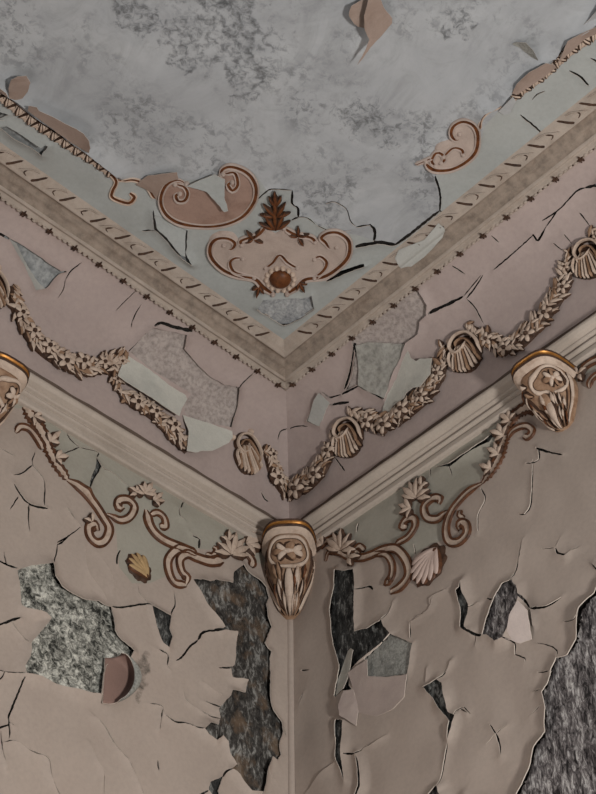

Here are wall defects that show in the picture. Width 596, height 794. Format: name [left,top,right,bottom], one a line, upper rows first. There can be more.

crack [328,176,442,279]
crack [429,184,596,324]
peeling [118,318,246,453]
peeling [303,284,437,433]
crack [424,420,501,479]
peeling [5,553,142,708]
crack [159,629,222,664]
peeling [187,559,288,794]
crack [328,711,354,793]
peeling [325,562,419,726]
crack [450,572,494,643]
peeling [412,570,596,794]